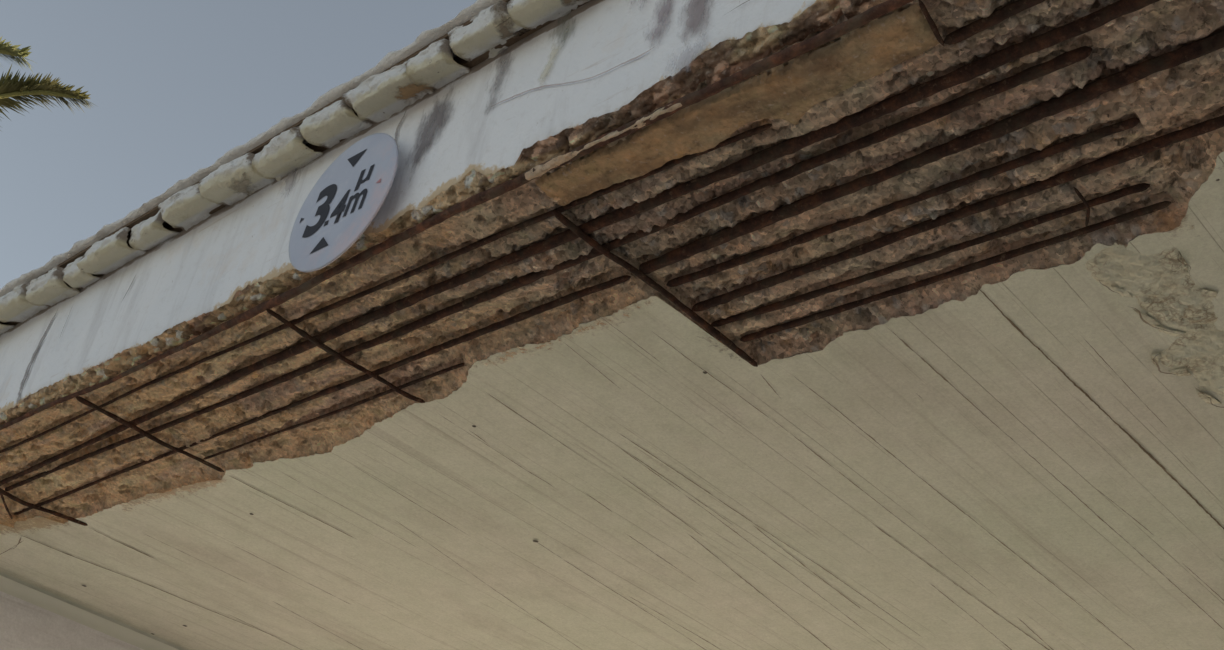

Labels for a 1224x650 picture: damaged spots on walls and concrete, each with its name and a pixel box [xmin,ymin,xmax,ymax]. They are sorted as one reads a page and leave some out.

spalling [0,124,772,528]
rust [395,83,430,100]
rust [490,2,530,39]
spalling [0,0,1224,425]